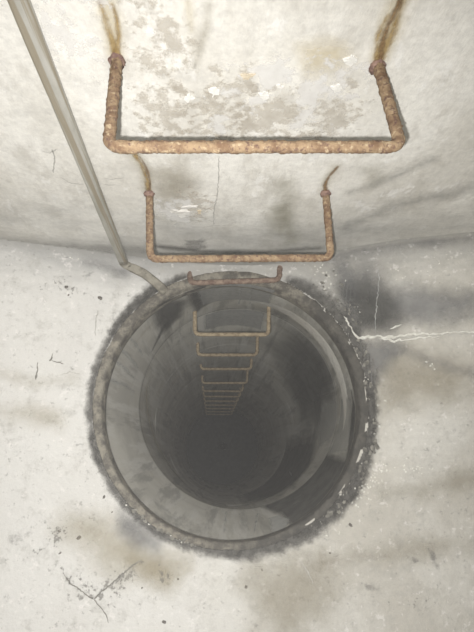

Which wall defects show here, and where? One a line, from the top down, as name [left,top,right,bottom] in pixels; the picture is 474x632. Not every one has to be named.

corrosion [108,9,120,54]
corrosion [375,0,402,60]
crack [344,269,474,343]
damp [86,270,471,560]
crack [63,559,142,623]